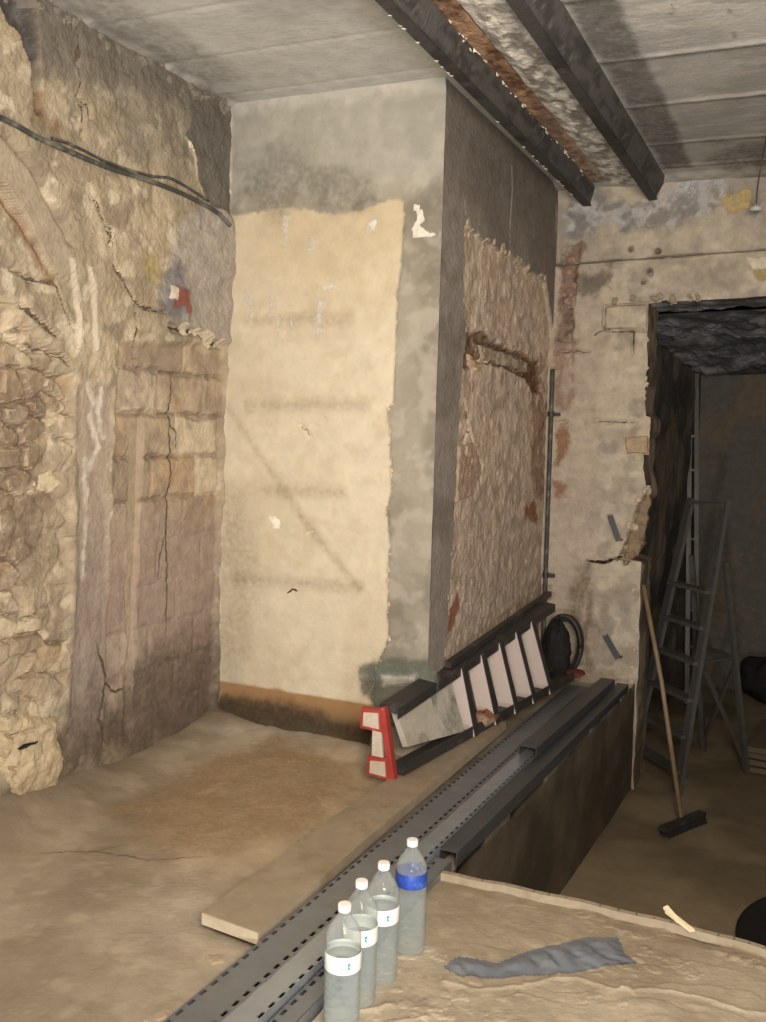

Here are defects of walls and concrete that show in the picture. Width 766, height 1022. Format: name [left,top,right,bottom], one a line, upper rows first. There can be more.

peeling [464,350,485,372]
spalling [455,442,482,502]
corrosion [556,429,569,465]
spalling [625,435,649,475]
crack [157,361,176,646]
spalling [588,485,651,599]
flaking render [447,579,459,634]